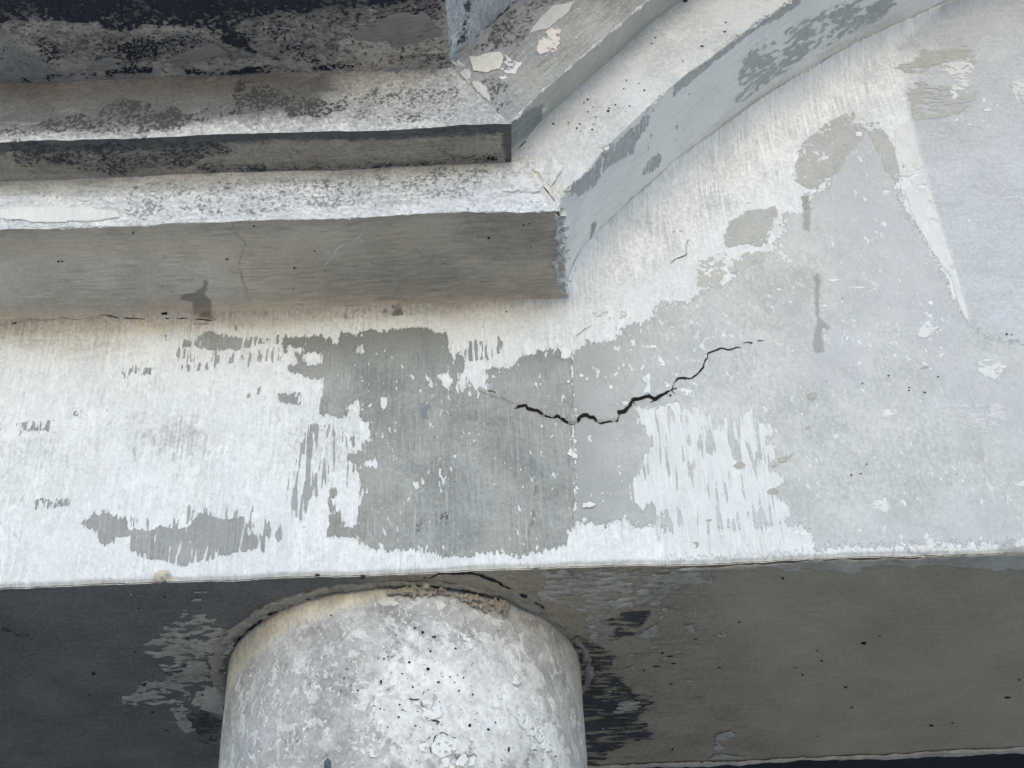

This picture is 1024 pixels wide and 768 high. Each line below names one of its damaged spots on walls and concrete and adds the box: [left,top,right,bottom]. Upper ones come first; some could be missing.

peeling [895,45,979,120]
peeling [448,0,897,295]
peeling [181,111,1024,559]
crack [479,340,763,425]
peeling [82,512,267,598]
leakage [190,711,222,756]